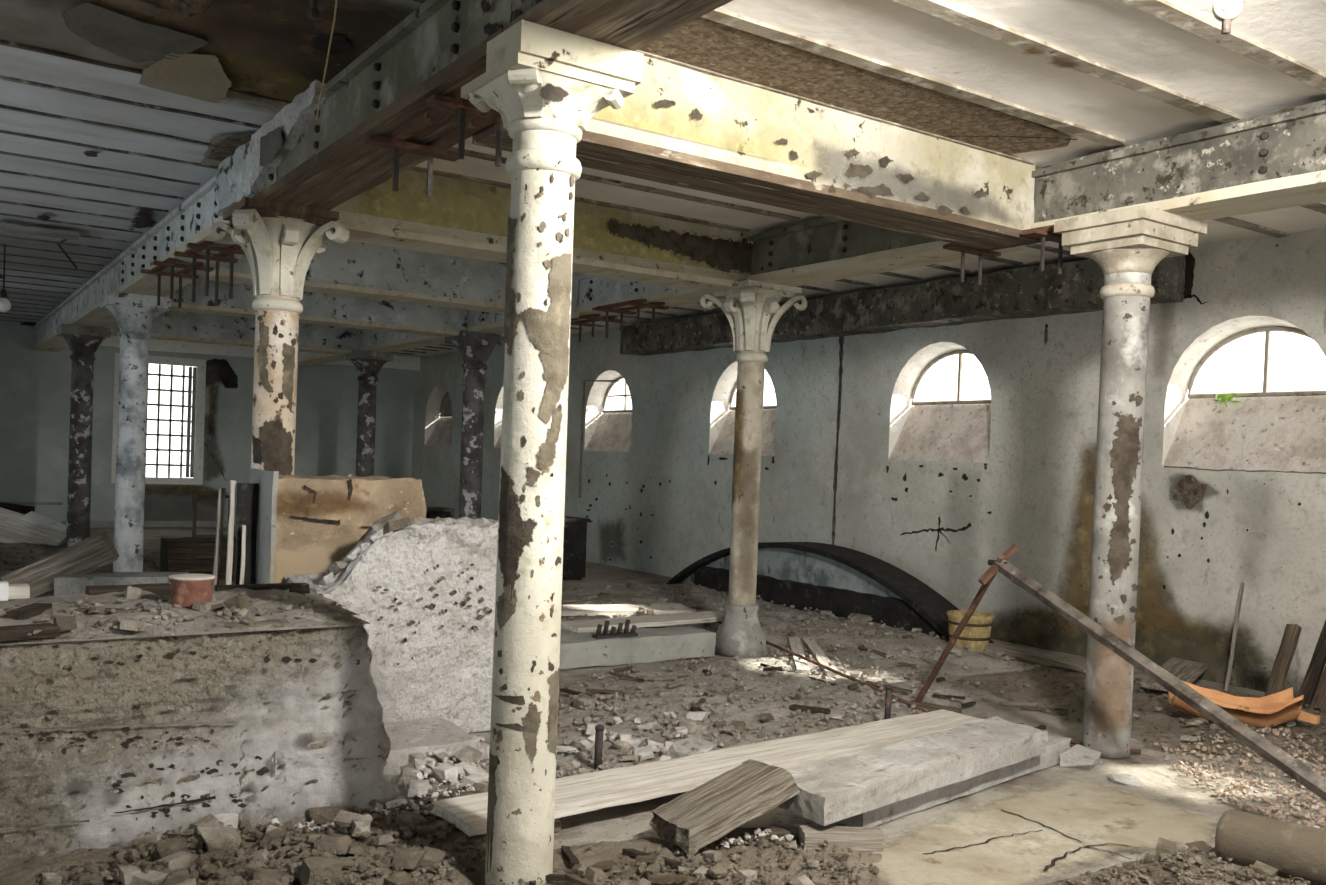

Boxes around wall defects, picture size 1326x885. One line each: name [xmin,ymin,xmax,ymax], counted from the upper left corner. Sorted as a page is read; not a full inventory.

peeling [62,3,232,103]
peeling [606,218,753,274]
peeling [776,138,798,161]
spalling [638,17,1077,154]
peeling [806,148,1007,220]
peeling [252,315,296,475]
peeling [375,175,575,875]
water stain [990,446,1096,657]
peeling [1094,393,1143,625]
spalling [1170,475,1229,540]
water stain [1135,510,1302,698]
crack [922,809,1139,870]